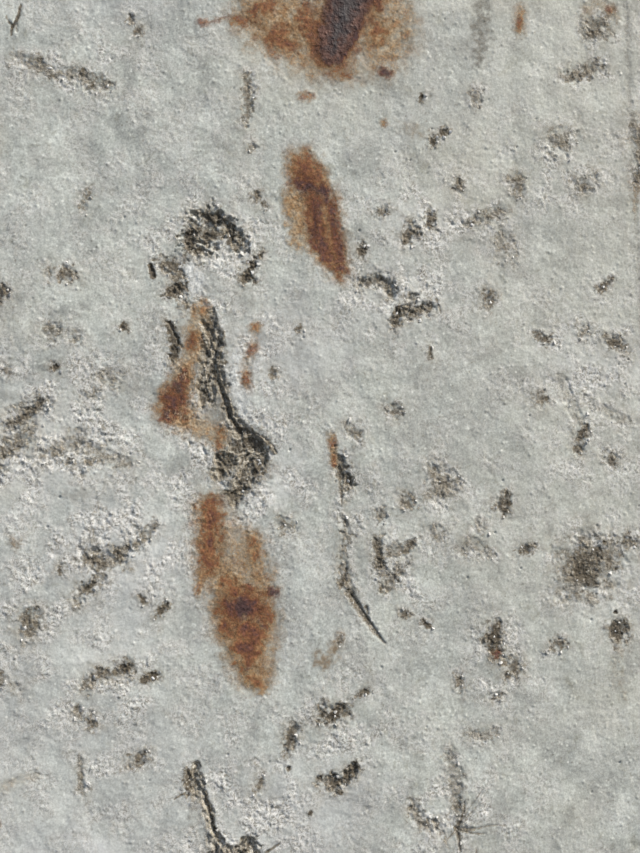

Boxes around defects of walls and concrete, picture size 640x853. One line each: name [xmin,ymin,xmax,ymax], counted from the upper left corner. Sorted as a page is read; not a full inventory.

corrosion [198,0,414,81]
corrosion [282,147,349,282]
corrosion [155,299,228,451]
corrosion [192,492,280,695]